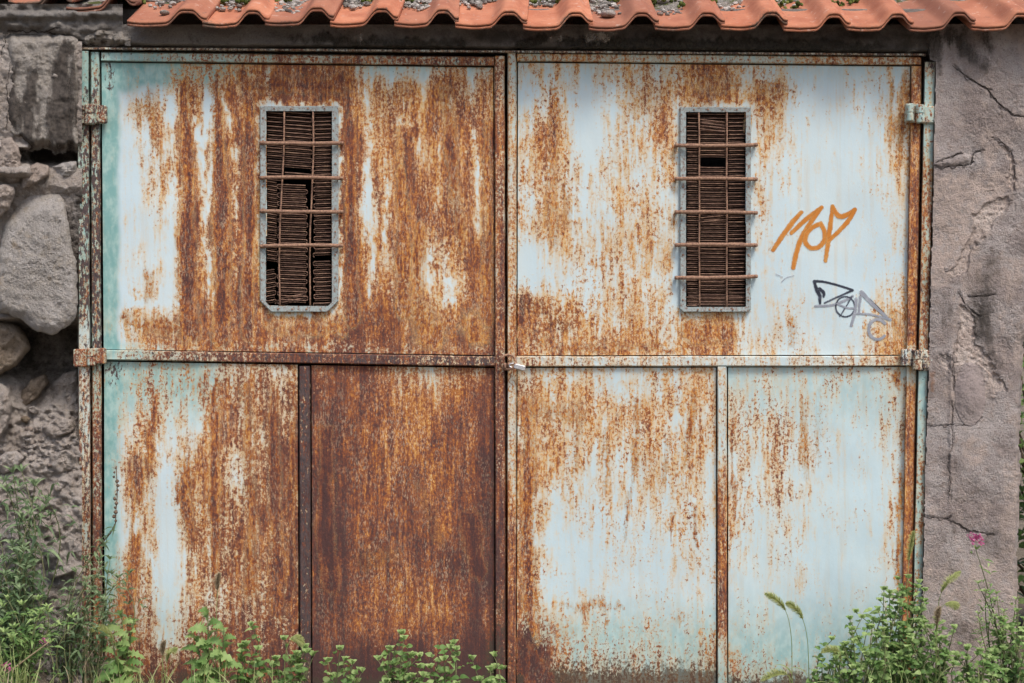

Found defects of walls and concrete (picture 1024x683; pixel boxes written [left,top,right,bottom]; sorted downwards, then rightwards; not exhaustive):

rust [121,67,362,349]
rust [393,126,448,351]
rust [545,88,572,247]
rust [516,292,675,355]
crack [952,65,1022,117]
rust [113,531,141,645]
rust [130,394,158,504]
rust [175,457,195,546]
rust [208,378,222,598]
rust [239,377,297,619]
rust [516,395,587,683]
crack [921,359,994,535]